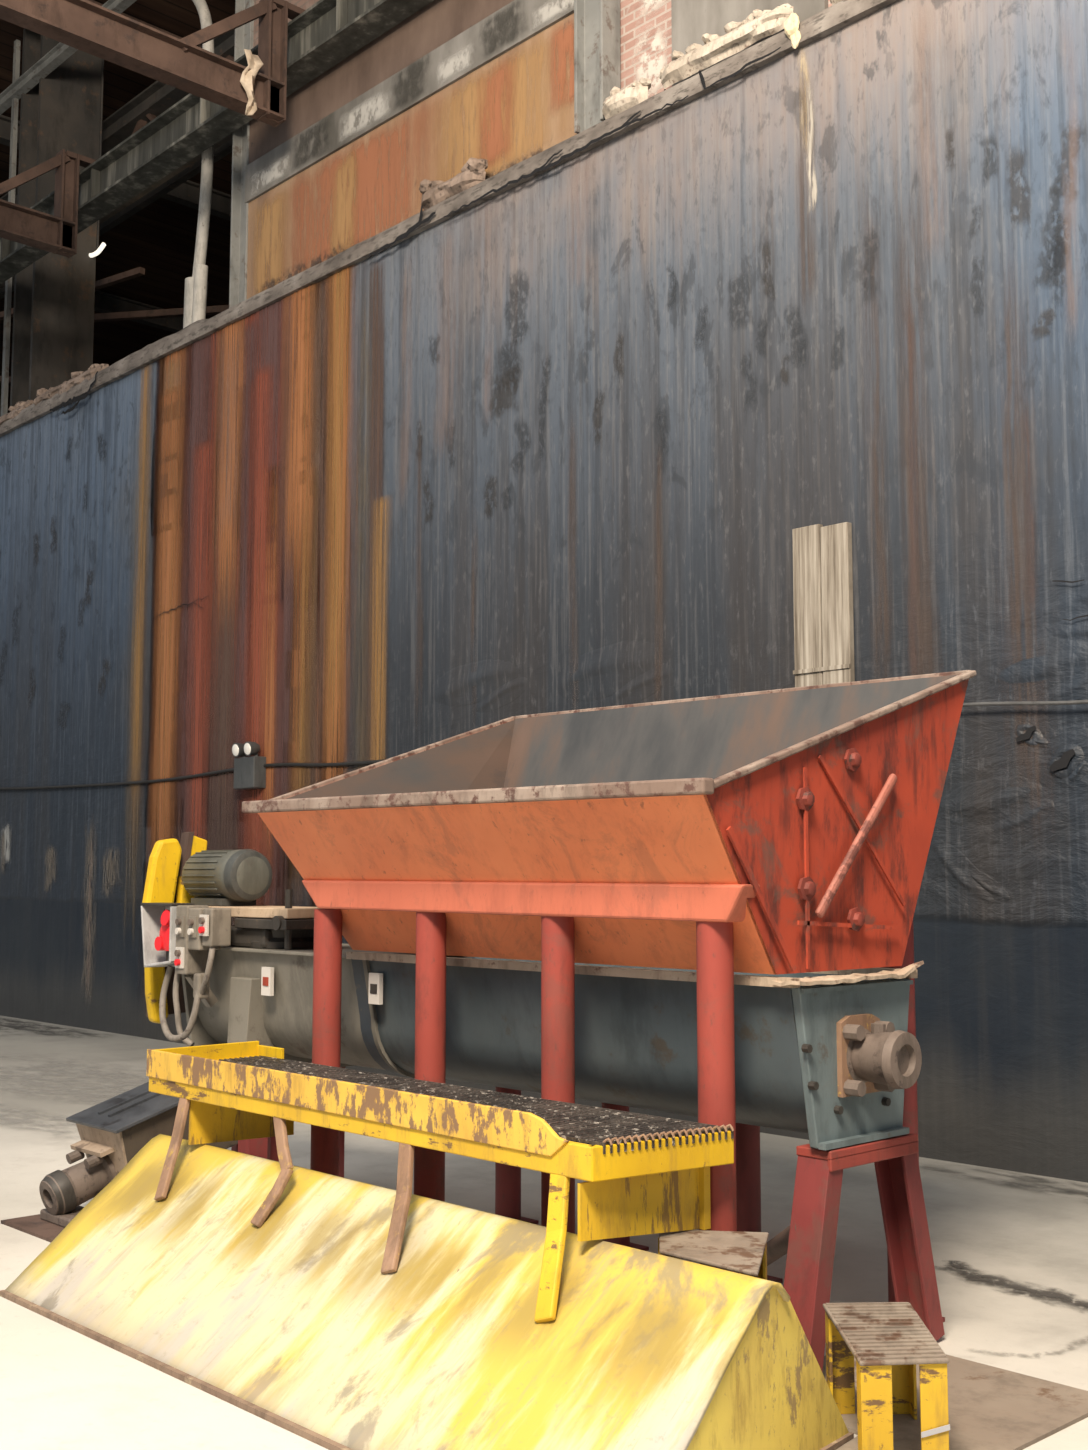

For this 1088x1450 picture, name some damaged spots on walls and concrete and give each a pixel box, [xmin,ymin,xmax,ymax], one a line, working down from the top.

leakage [484,5,518,52]
leakage [538,0,574,22]
leakage [343,49,469,135]
spalling [602,4,794,120]
efflorescence [784,13,817,205]
leakage [255,124,326,189]
rust [134,119,420,877]
crack [1052,580,1088,621]
crack [944,1261,1088,1309]